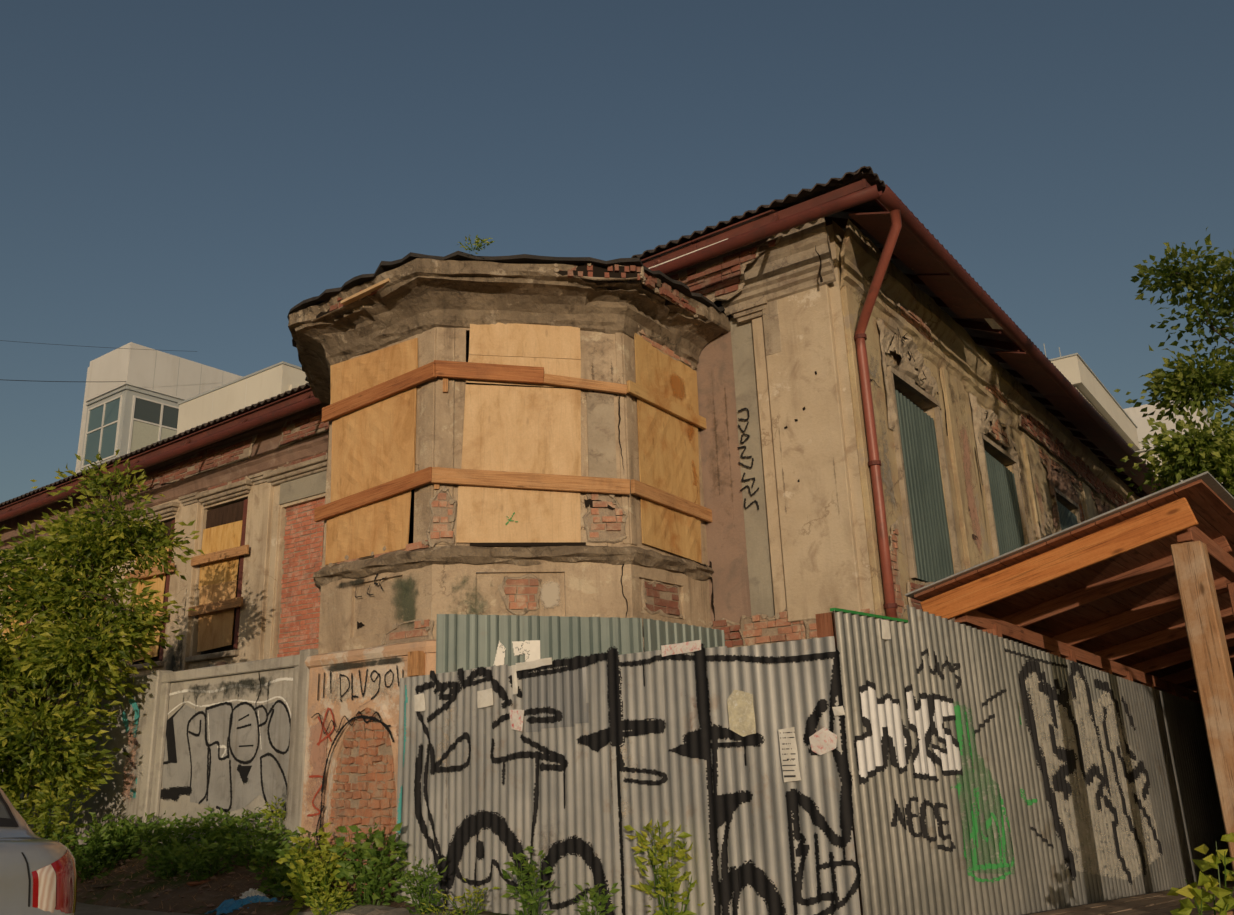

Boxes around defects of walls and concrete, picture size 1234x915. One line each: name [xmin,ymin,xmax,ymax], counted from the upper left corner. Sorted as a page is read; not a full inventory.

spalling [877,302,943,431]
spalling [969,383,1021,485]
spalling [328,485,457,567]
spalling [582,493,628,543]
spalling [1036,448,1110,528]
spalling [381,619,434,645]
spalling [497,573,560,616]
spalling [641,578,683,619]
spalling [709,608,818,648]
spalling [889,520,934,619]